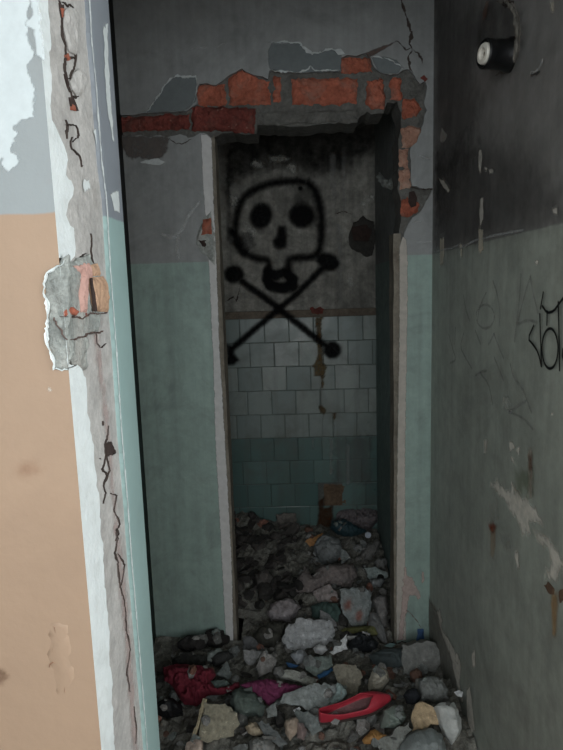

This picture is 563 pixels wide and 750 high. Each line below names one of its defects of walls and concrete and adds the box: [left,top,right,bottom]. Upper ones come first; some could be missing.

peeling [0,0,45,172]
crack [58,0,83,167]
crack [397,0,423,71]
crack [79,233,94,263]
spalling [42,23,475,750]
rust [312,317,327,388]
crack [99,421,137,744]
rust [544,582,563,634]